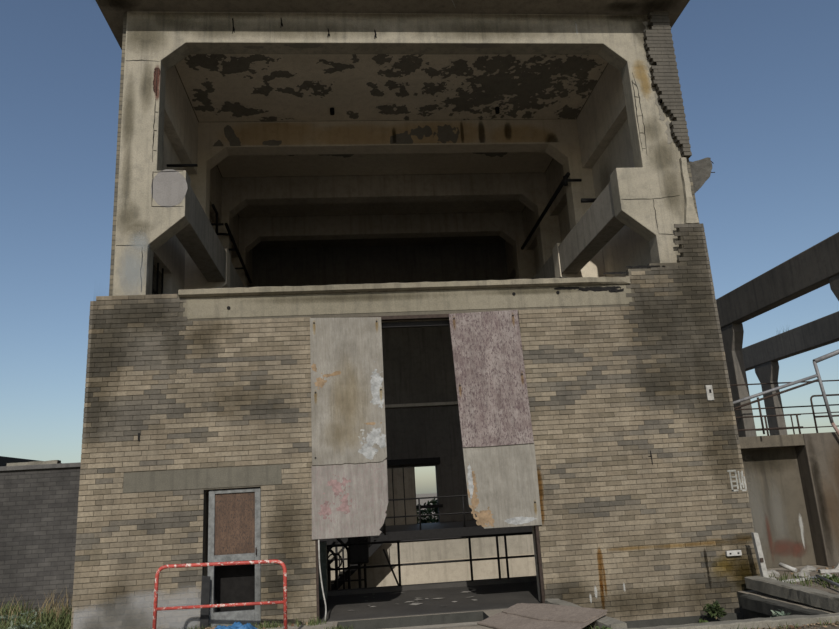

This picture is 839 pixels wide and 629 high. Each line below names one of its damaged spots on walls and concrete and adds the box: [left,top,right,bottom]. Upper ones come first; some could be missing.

peeling [184,46,360,122]
peeling [367,43,604,144]
crack [151,100,181,207]
crack [116,245,143,292]
peeling [370,361,384,408]
peeling [358,422,386,460]